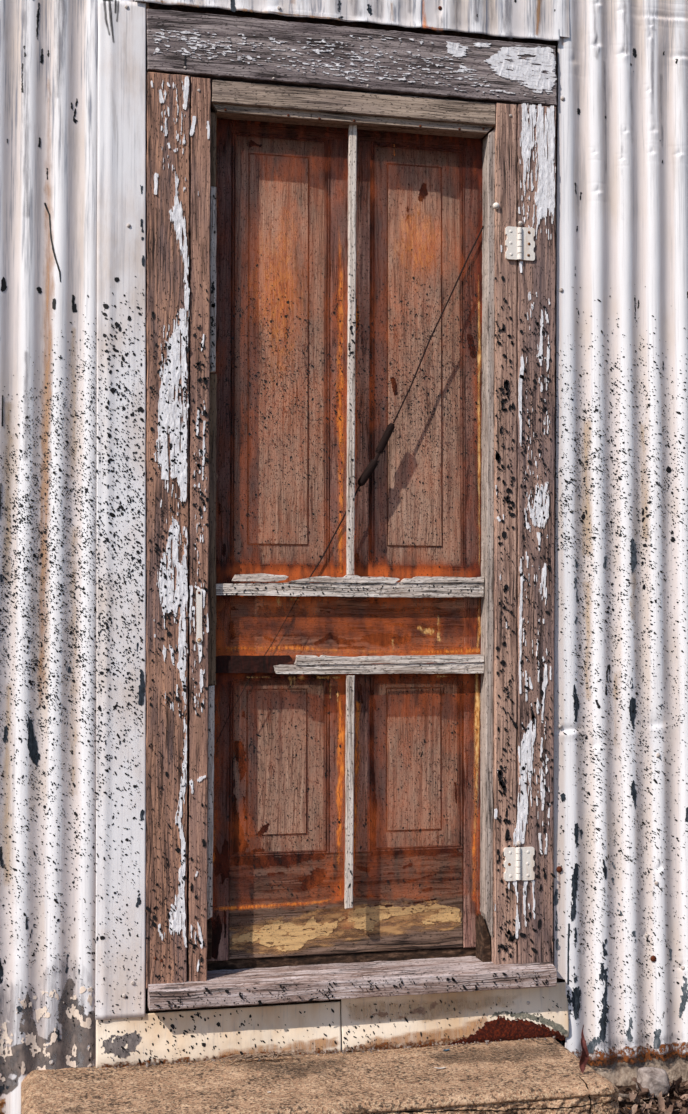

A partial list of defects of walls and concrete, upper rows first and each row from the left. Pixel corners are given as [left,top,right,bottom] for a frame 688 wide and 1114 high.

peeling [153,29,557,251]
peeling [140,76,462,972]
peeling [506,292,565,854]
peeling [508,880,535,939]
peeling [553,863,579,951]
peeling [0,954,142,1096]
crack [394,1076,615,1114]
peeling [587,939,609,1054]
corrosion [572,1042,688,1066]
peeling [653,1029,661,1049]
peeling [678,976,688,1018]